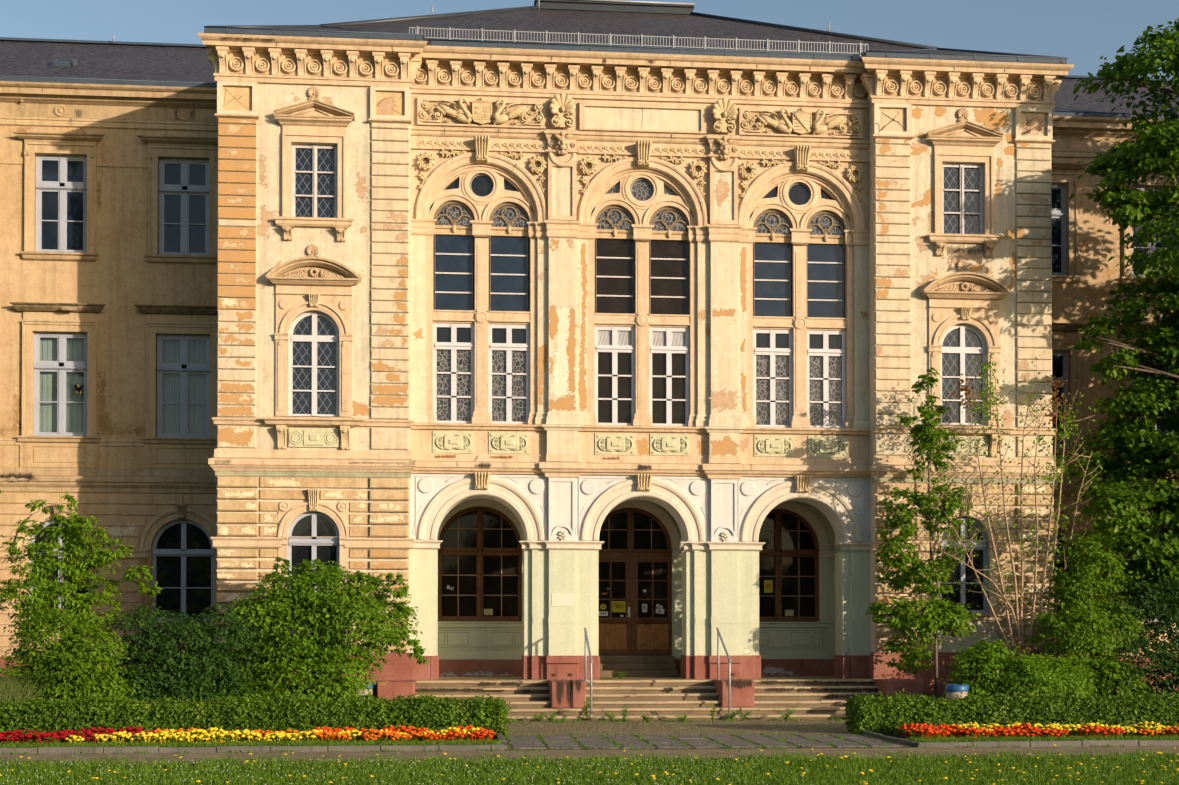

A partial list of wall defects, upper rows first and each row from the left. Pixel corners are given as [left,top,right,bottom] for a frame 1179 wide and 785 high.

peeling [973,107,1030,196]
peeling [218,118,281,368]
peeling [359,212,424,347]
peeling [535,238,589,411]
peeling [698,247,748,336]
peeling [910,185,934,254]
peeling [214,383,255,465]
peeling [352,361,408,416]
peeling [706,370,748,413]
peeling [219,478,306,535]
peeling [325,490,408,523]
peeling [217,549,254,579]